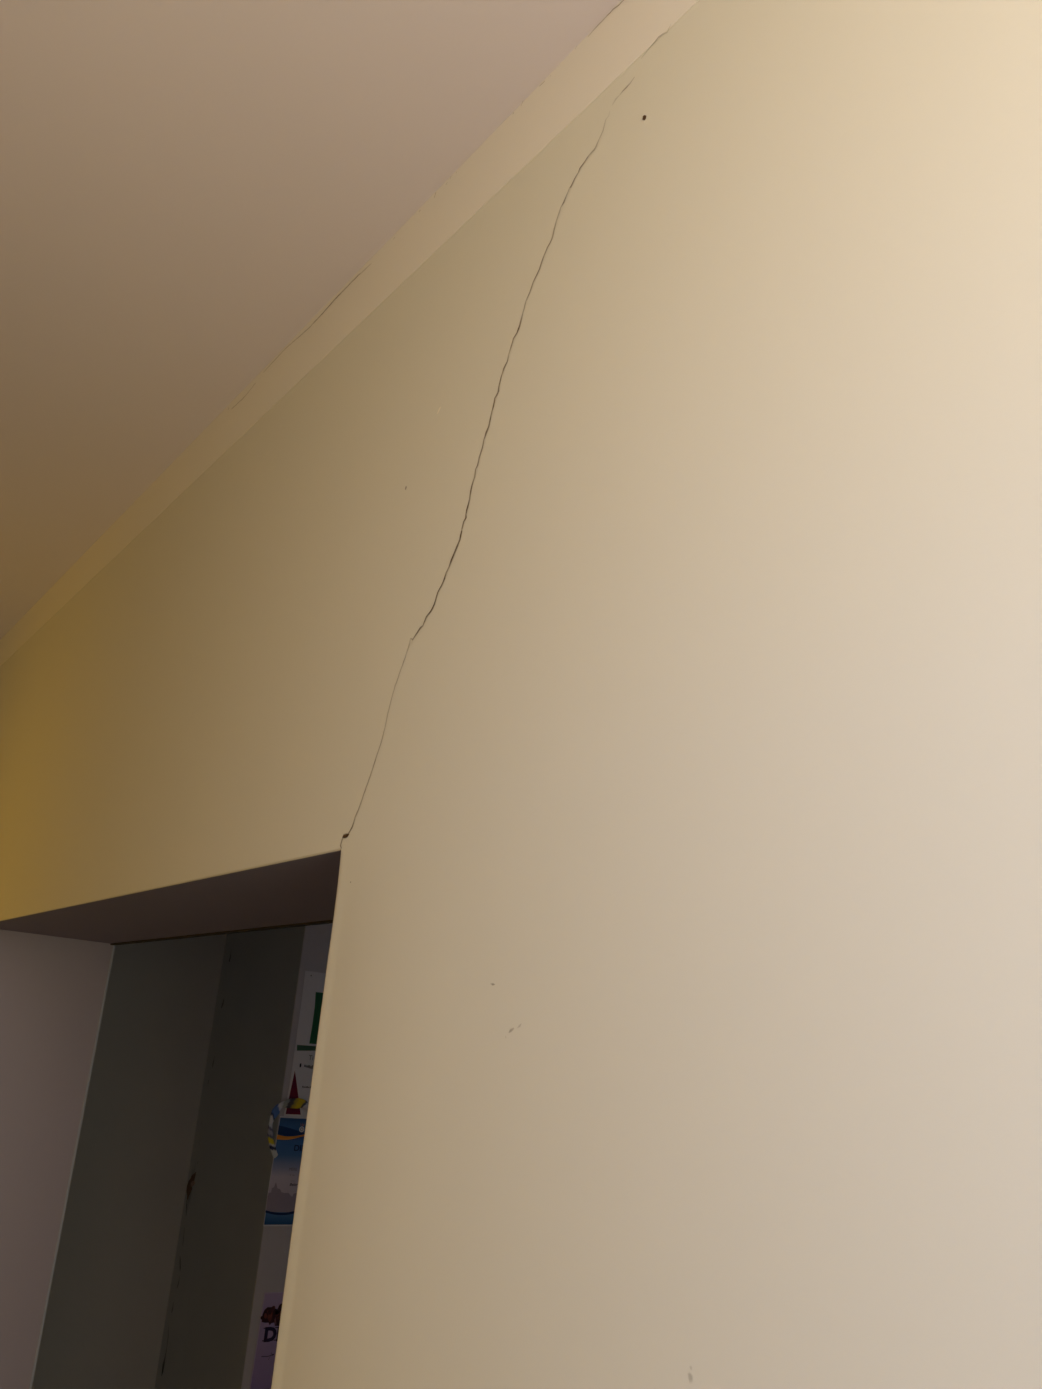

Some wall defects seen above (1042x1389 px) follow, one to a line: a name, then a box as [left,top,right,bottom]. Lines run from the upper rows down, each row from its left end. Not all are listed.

crack [414,239,552,637]